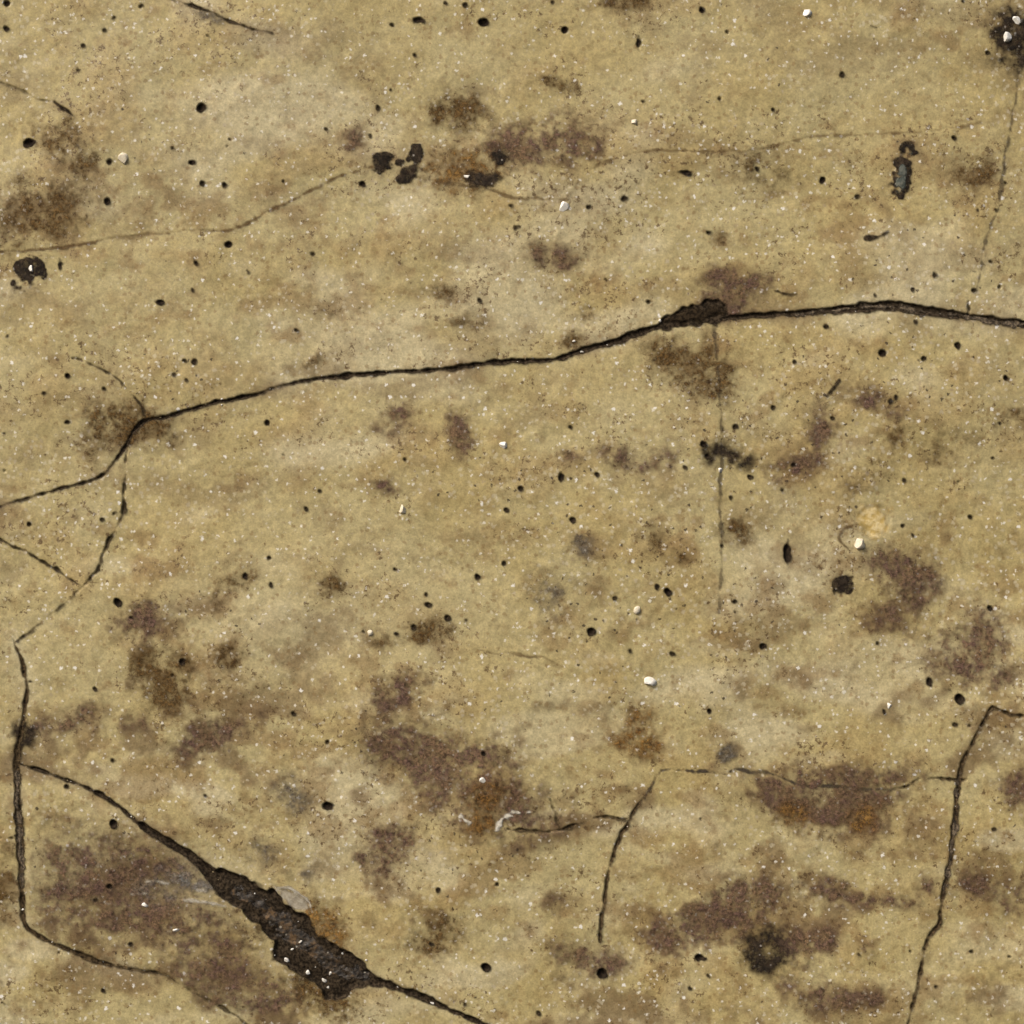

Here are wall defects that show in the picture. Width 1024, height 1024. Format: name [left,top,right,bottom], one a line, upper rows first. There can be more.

leakage [430,97,485,131]
crack [0,94,1024,611]
leakage [40,834,302,1014]
crack [13,628,486,1024]
spalling [275,887,309,909]
crack [508,706,1023,1024]
mould [743,927,796,974]